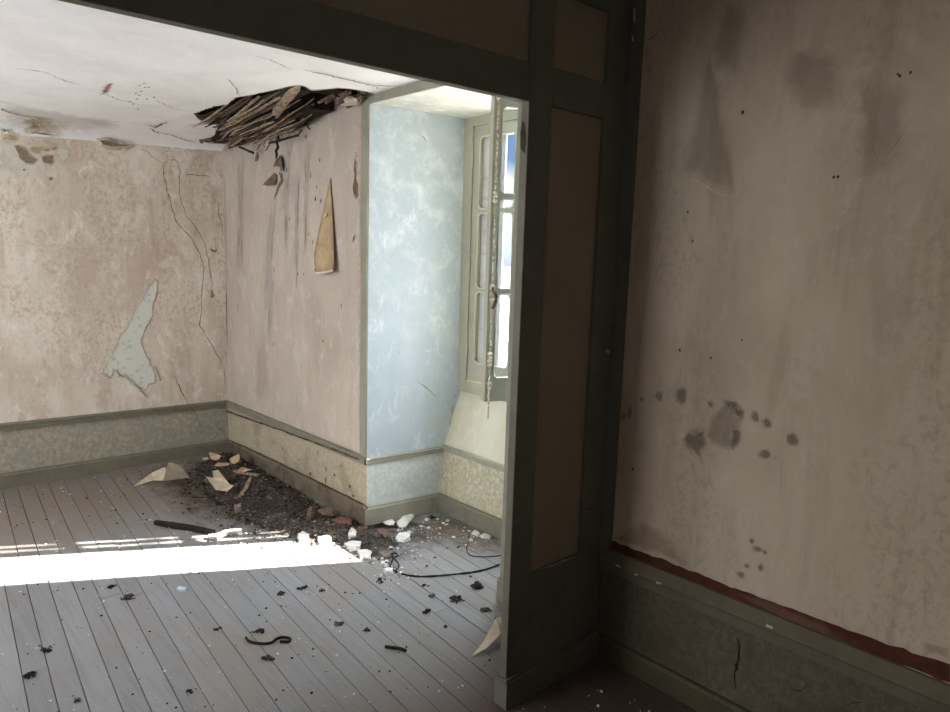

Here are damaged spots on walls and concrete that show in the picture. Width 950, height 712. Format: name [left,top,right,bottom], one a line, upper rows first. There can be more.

crack [1,108,58,141]
spalling [193,85,374,144]
flaking render [13,144,55,180]
peeling [263,168,287,186]
crack [101,93,364,505]
spalling [100,278,160,397]